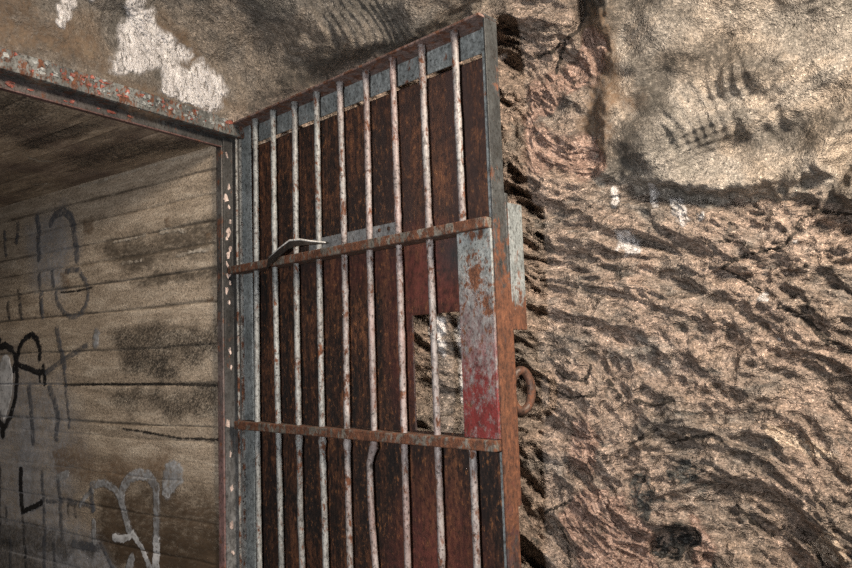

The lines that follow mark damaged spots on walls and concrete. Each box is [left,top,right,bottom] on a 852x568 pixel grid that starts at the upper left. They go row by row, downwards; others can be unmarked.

crack [718,208,852,293]
crack [777,296,852,352]
leakage [113,322,218,418]